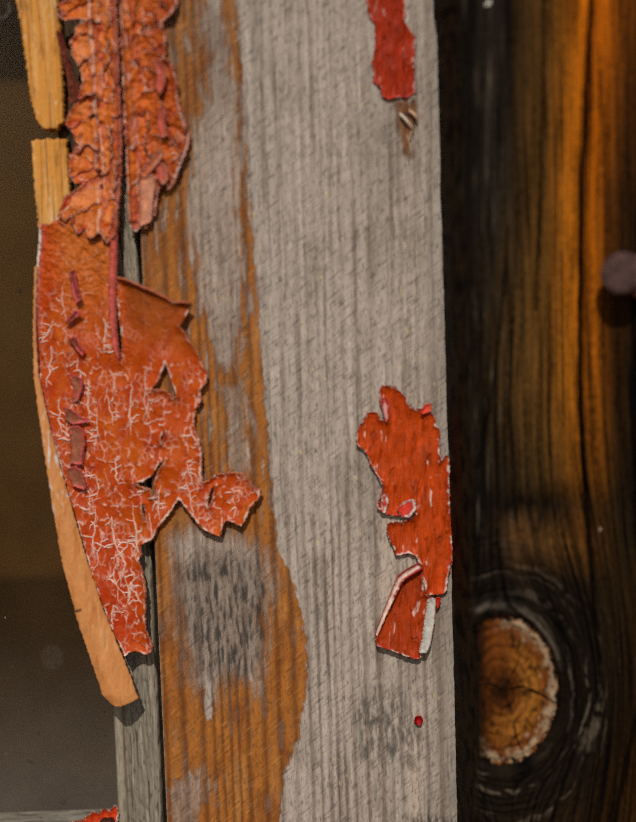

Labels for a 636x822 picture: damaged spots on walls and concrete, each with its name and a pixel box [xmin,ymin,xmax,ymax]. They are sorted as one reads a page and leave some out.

peeling [366,0,418,158]
peeling [33,0,262,707]
peeling [356,385,453,660]
peeling [71,805,119,822]